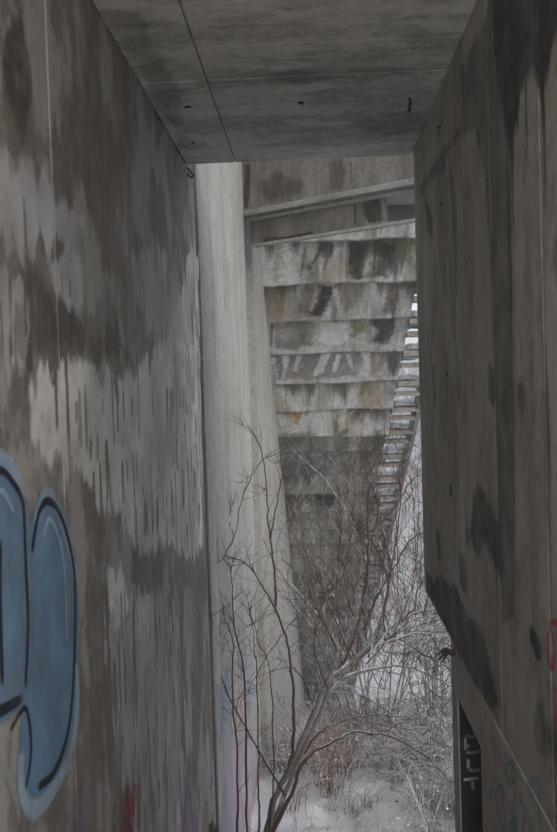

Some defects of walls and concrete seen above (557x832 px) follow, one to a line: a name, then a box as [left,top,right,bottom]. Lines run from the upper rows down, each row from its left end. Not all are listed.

leakage [487,0,557,179]
leakage [349,240,405,280]
leakage [271,286,362,380]
leakage [371,284,400,343]
leakage [426,572,496,706]